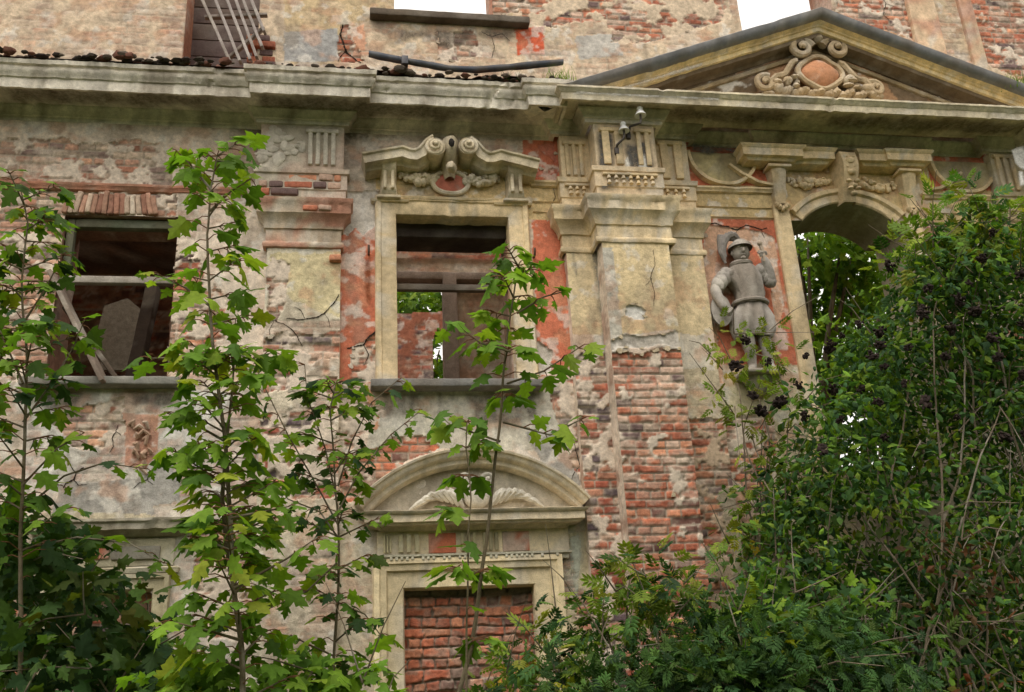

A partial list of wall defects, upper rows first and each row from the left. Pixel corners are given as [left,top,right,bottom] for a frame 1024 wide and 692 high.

crack [338,25,361,63]
flaking render [492,0,733,44]
flaking render [0,136,178,382]
crack [269,295,339,345]
flaking render [626,302,648,319]
crack [347,331,375,361]
flaking render [258,256,440,502]
flaking render [53,396,127,451]
flaking render [551,330,778,689]